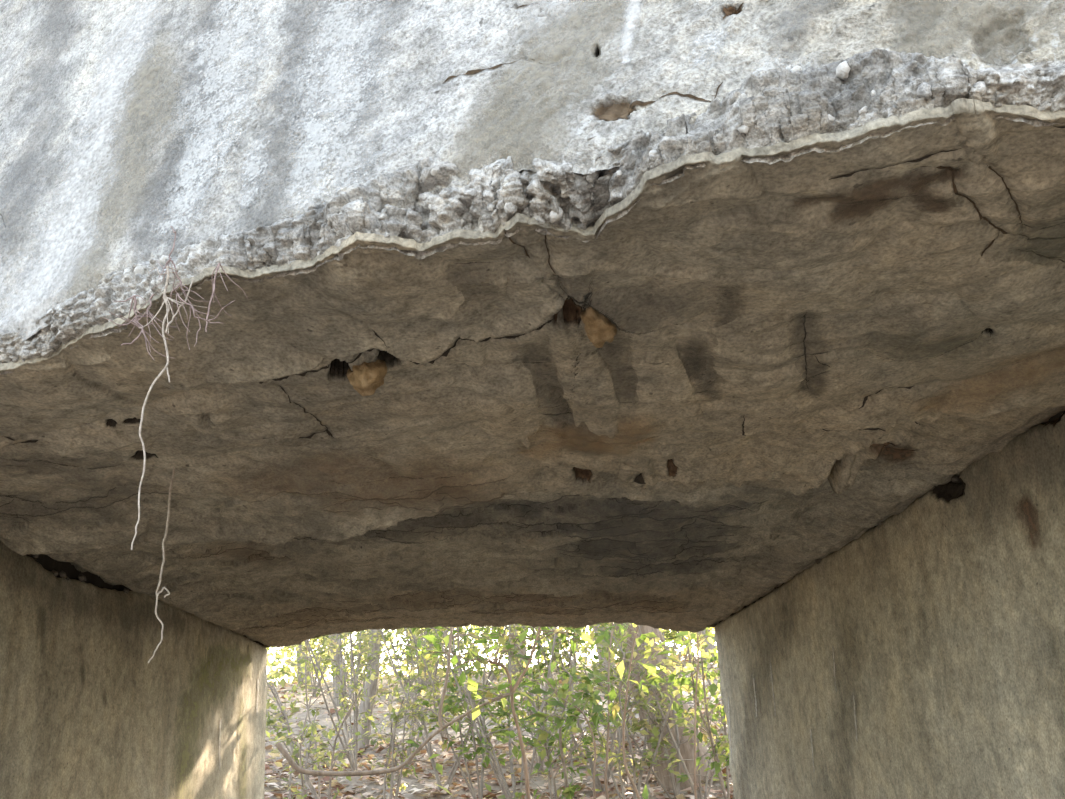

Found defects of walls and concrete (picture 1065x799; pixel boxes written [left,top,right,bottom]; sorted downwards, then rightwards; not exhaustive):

leakage [241,0,407,227]
crack [444,60,527,83]
leakage [458,0,640,168]
crack [631,82,723,108]
spalling [723,6,742,16]
leakage [755,59,822,72]
spalling [0,48,1065,375]
crack [829,147,1065,263]
crack [259,231,589,439]
crack [803,315,830,388]